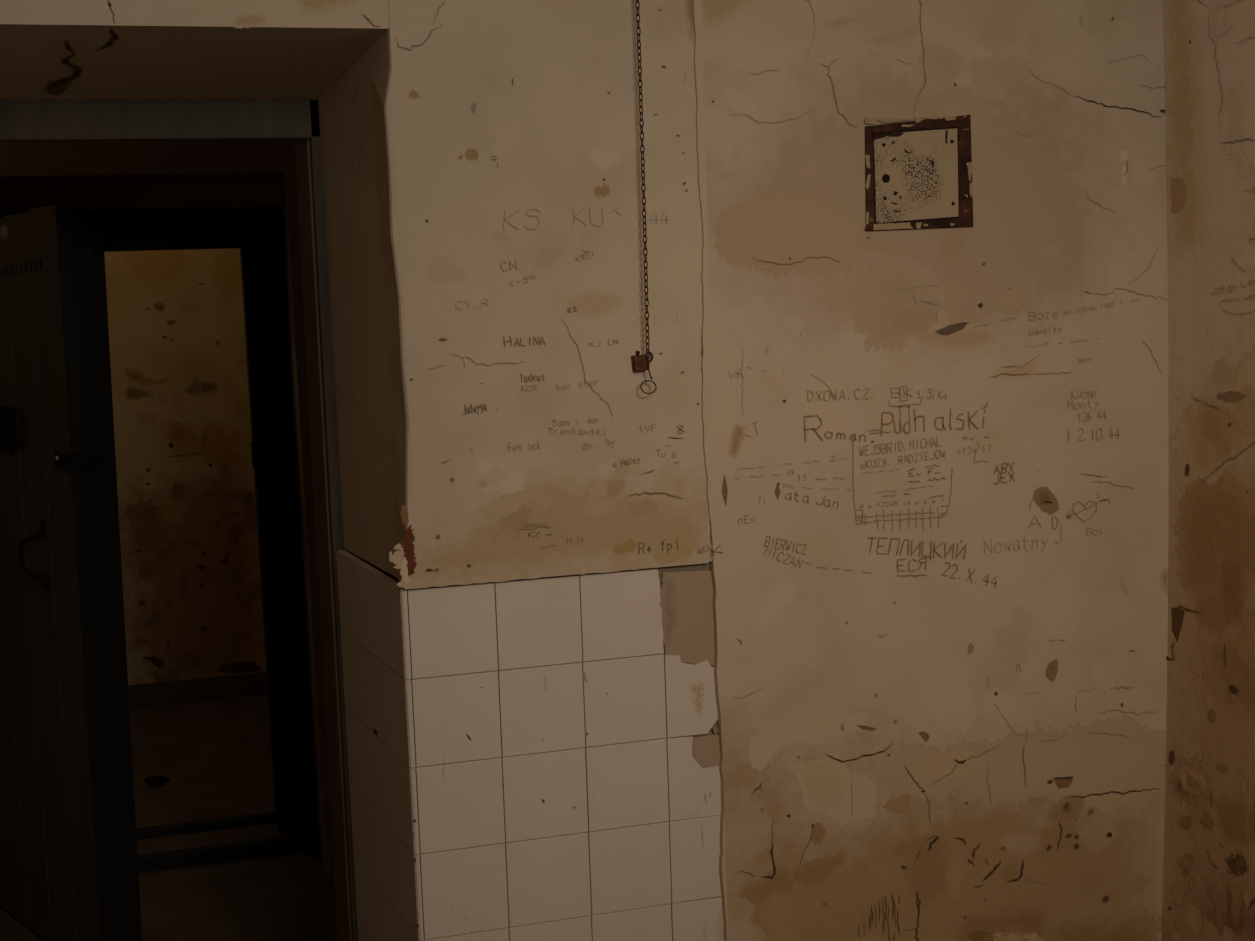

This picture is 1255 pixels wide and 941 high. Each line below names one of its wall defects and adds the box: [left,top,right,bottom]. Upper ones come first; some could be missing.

crack [49,0,118,89]
crack [1198,0,1255,143]
crack [1086,246,1169,299]
crack [1200,441,1255,483]
peeling [401,557,412,583]
peeling [693,726,720,768]
crack [826,677,1166,941]
crack [739,819,813,879]